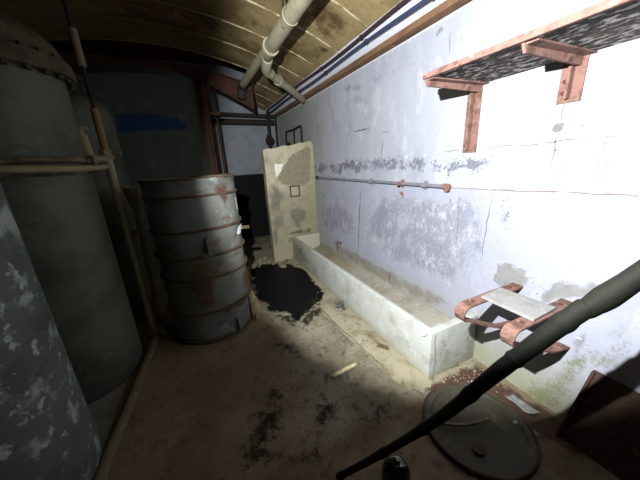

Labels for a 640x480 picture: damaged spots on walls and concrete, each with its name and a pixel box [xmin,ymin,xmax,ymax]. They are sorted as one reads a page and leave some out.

spalling [275,147,493,186]
crack [457,104,639,260]
water stain [251,244,324,326]
peeling [364,196,477,288]
spalling [494,261,531,287]
spalling [542,278,602,301]